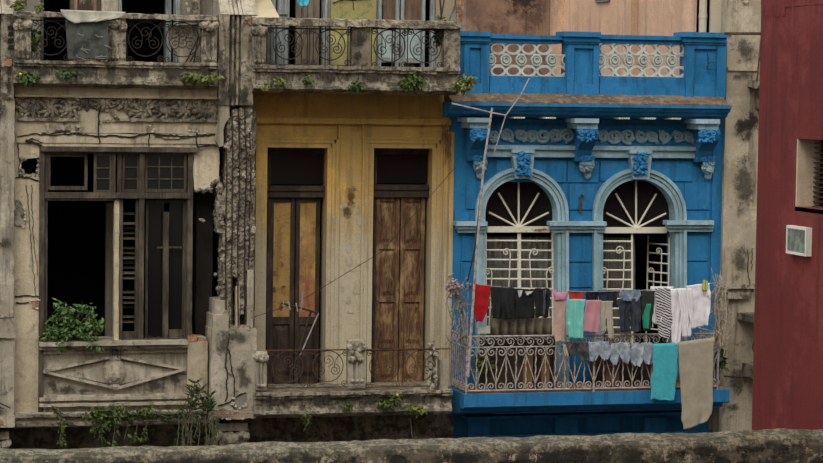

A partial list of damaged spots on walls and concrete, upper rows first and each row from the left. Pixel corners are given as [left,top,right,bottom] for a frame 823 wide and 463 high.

spalling [18,156,40,177]
spalling [194,107,257,326]
leakage [344,188,358,218]
leakage [734,155,755,212]
leakage [733,246,747,279]
crack [218,333,246,410]